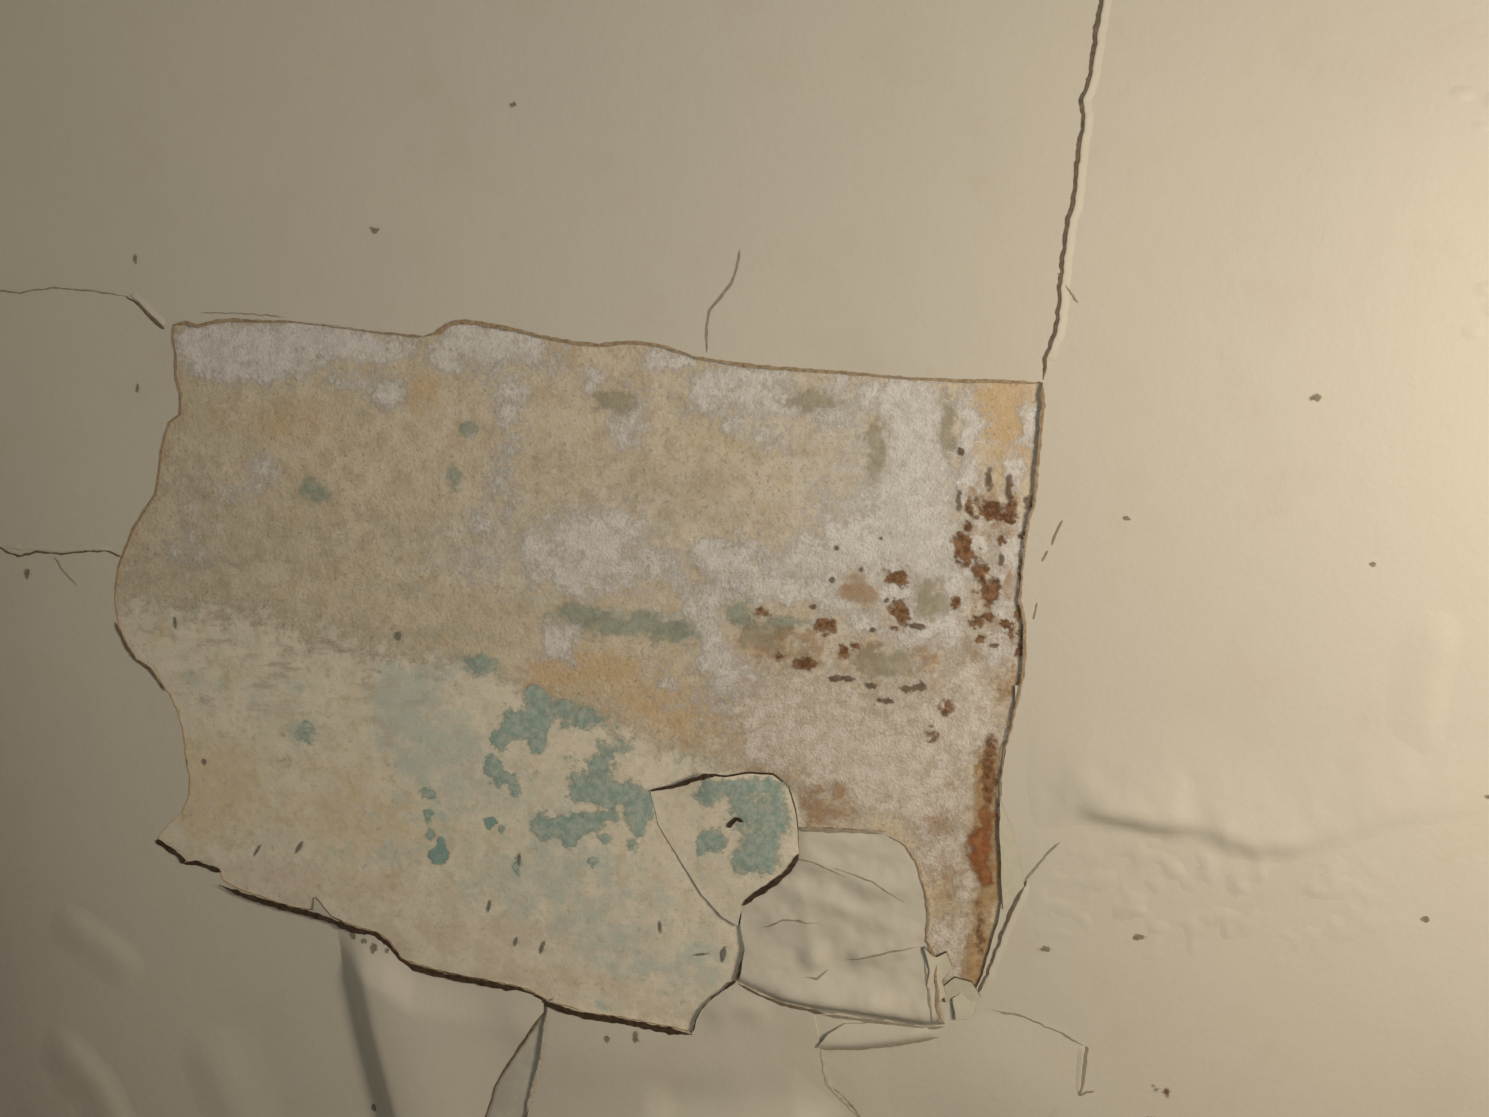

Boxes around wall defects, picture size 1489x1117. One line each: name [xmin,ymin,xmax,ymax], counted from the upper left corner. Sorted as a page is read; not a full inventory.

crack [1043,0,1112,380]
crack [0,287,166,329]
crack [204,310,279,318]
peeling [115,318,1046,1035]
water stain [167,320,1041,985]
rust [755,567,927,704]
rust [926,699,953,743]
rust [951,467,1032,657]
rust [962,734,1001,984]